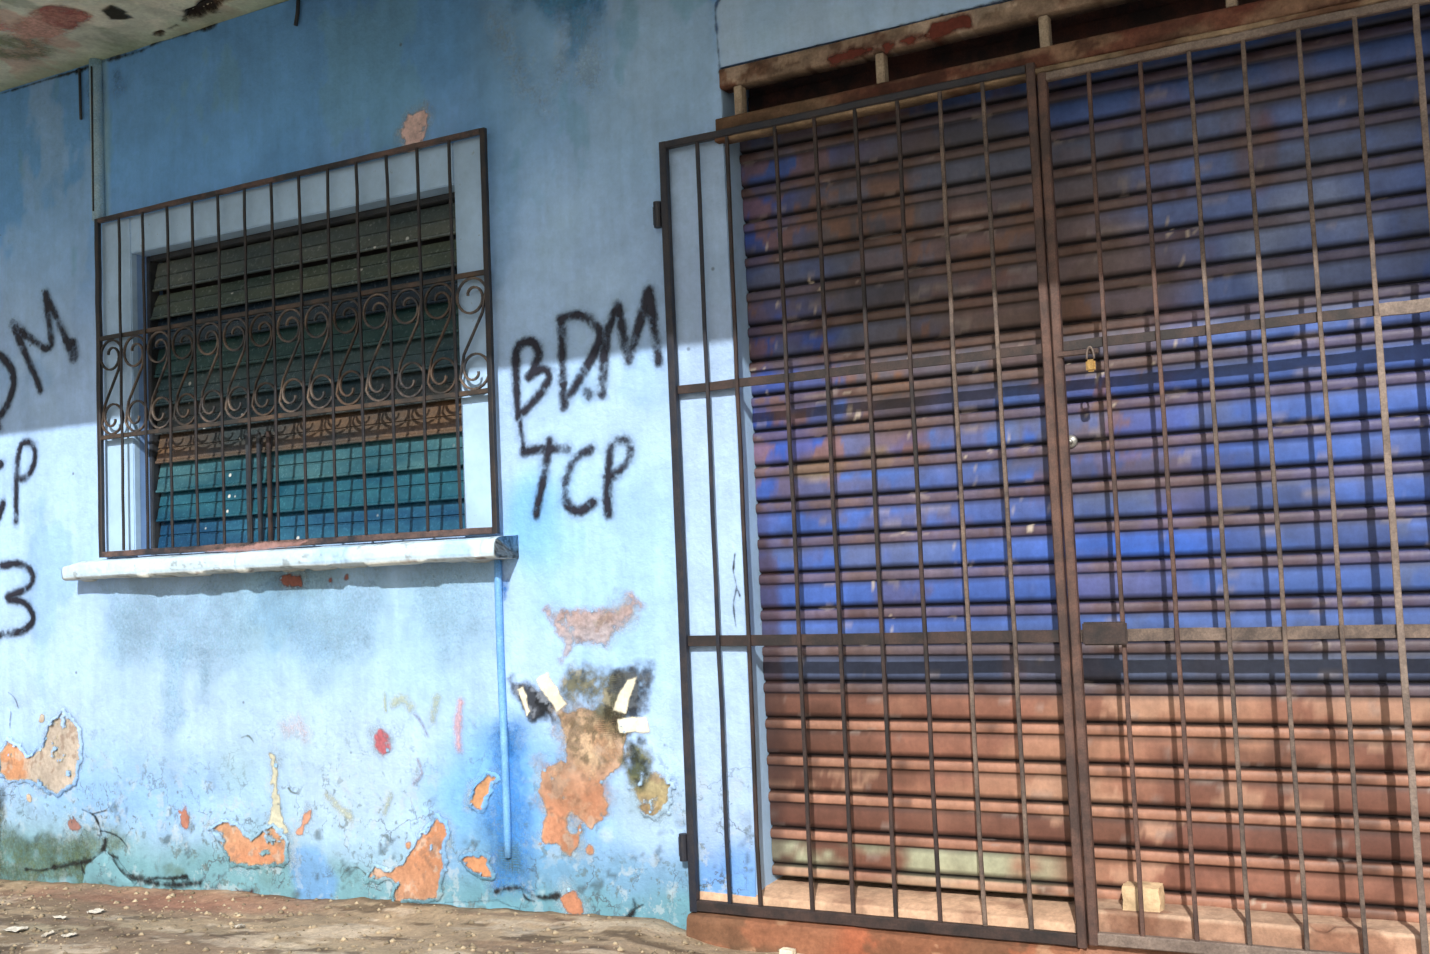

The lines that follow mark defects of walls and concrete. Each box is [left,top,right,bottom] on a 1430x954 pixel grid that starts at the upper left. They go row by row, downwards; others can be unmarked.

spalling [153,0,225,36]
corrosion [827,13,972,67]
peeling [546,594,642,655]
peeling [0,708,83,802]
peeling [372,727,390,754]
peeling [468,770,501,814]
peeling [538,708,626,857]
damp [0,794,119,884]
crack [25,809,201,888]
peeling [207,807,312,870]
peeling [363,812,496,904]
peeling [560,884,585,914]